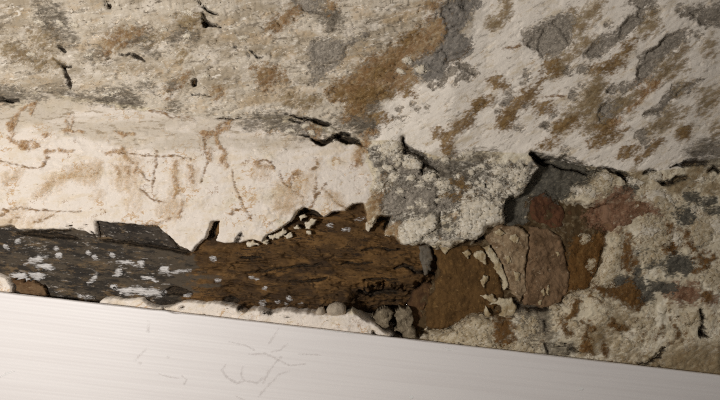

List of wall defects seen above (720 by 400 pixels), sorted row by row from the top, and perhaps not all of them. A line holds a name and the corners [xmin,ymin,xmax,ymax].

water stain [249,0,453,126]
crack [0,207,78,224]
crack [117,117,242,203]
crack [212,172,251,243]
peeling [246,214,317,247]
crack [258,113,363,211]
crack [401,137,436,174]
peeling [366,140,616,353]
water stain [432,0,720,375]
peeling [547,173,720,331]
peeling [633,129,652,149]